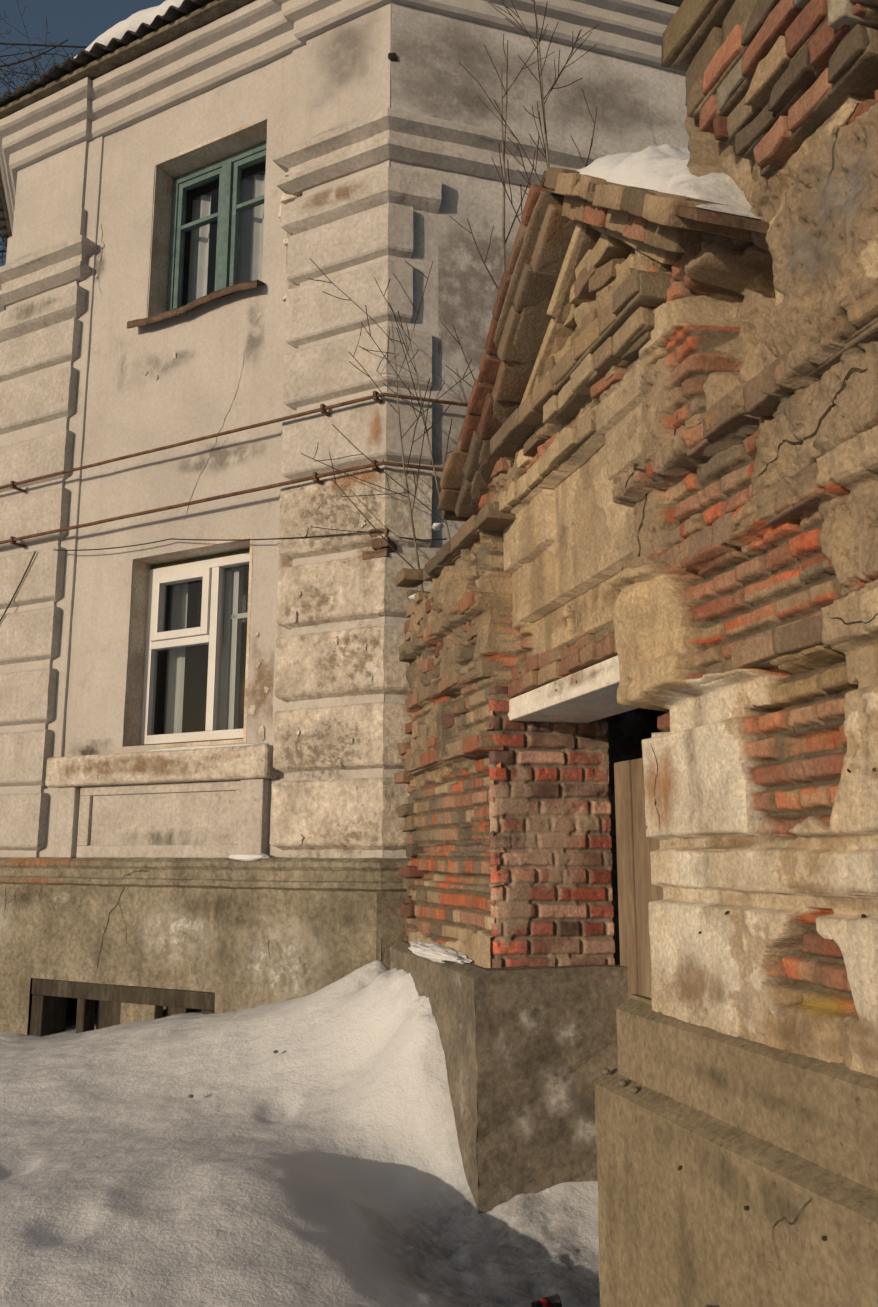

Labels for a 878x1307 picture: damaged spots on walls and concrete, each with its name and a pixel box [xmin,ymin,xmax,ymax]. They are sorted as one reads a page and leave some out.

spalling [590,331,651,400]
crack [758,368,868,476]
spalling [490,432,547,504]
spalling [399,641,444,673]
spalling [411,701,469,748]
crack [96,870,146,971]
flaking render [758,907,858,1016]